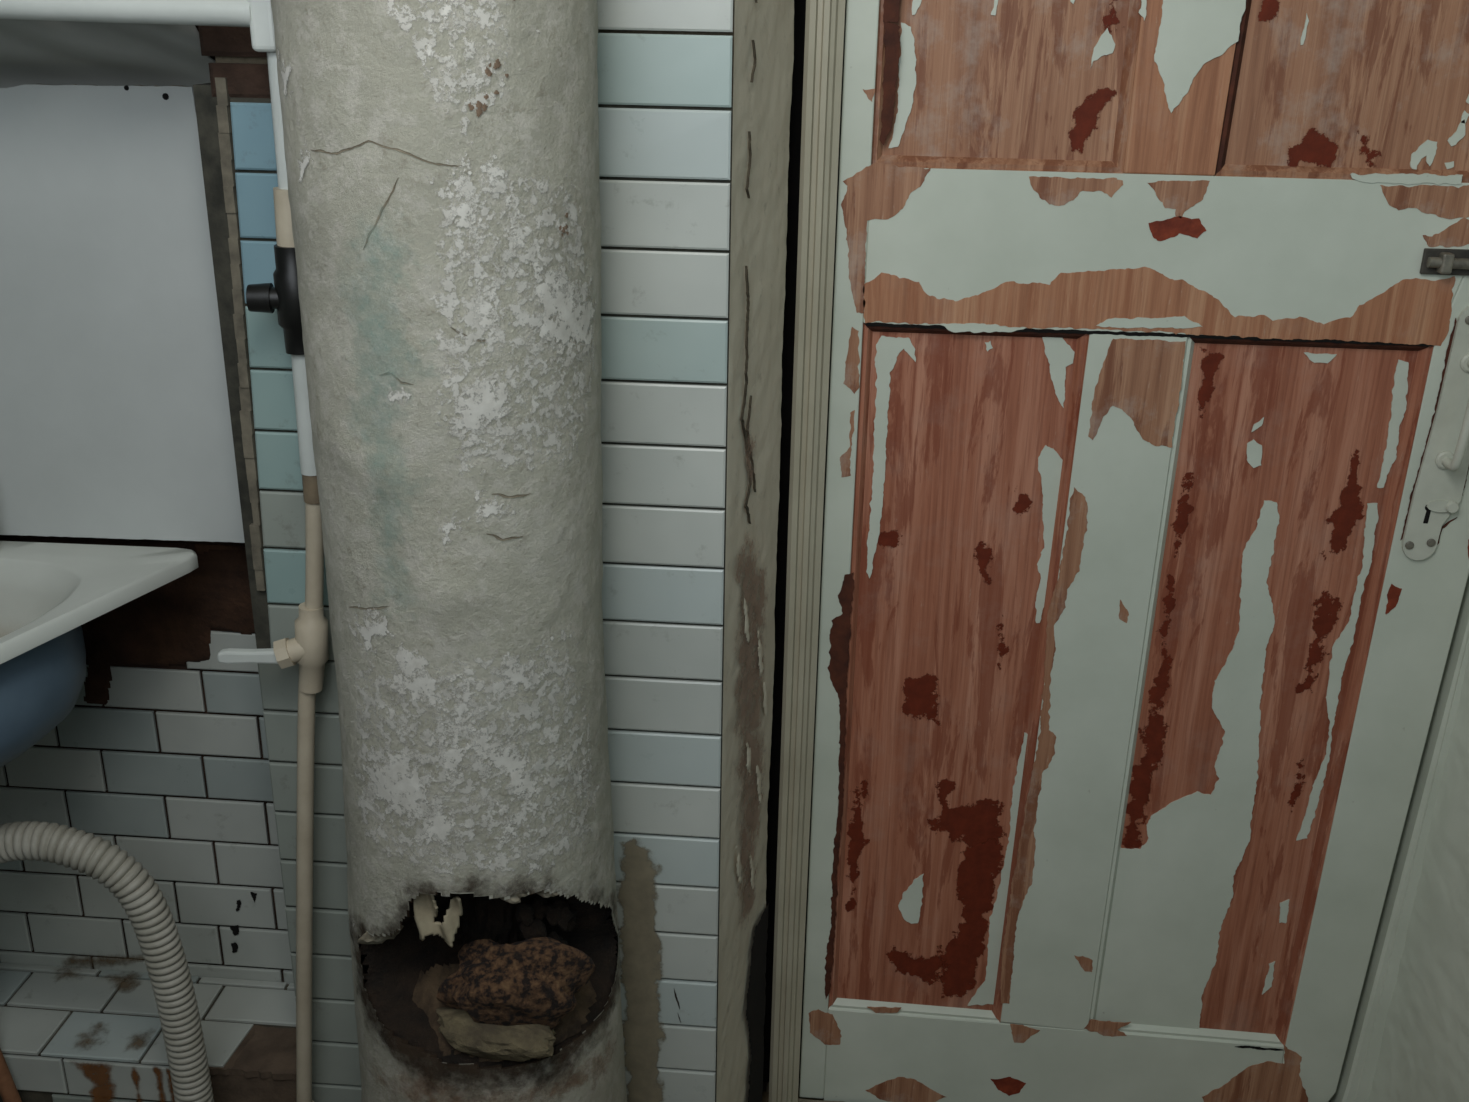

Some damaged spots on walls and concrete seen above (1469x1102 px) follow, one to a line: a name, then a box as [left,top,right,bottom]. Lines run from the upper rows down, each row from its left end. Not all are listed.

crack [310,140,462,250]
peeling [809,0,1469,1045]
spalling [84,548,255,705]
spalling [349,604,620,1089]
corrosion [77,1024,114,1102]
corrosion [131,1067,175,1102]
peeling [866,1077,945,1102]
peeling [991,1077,1026,1096]
peeling [1202,1045,1308,1102]